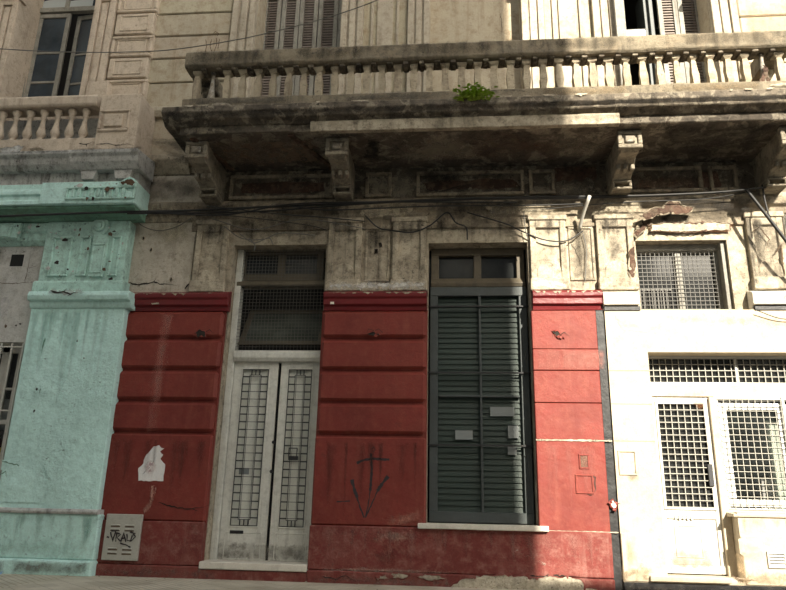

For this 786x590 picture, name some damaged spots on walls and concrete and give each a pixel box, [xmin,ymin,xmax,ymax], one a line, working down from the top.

peeling [625,201,731,278]
crack [129,280,189,289]
spalling [375,572,601,590]